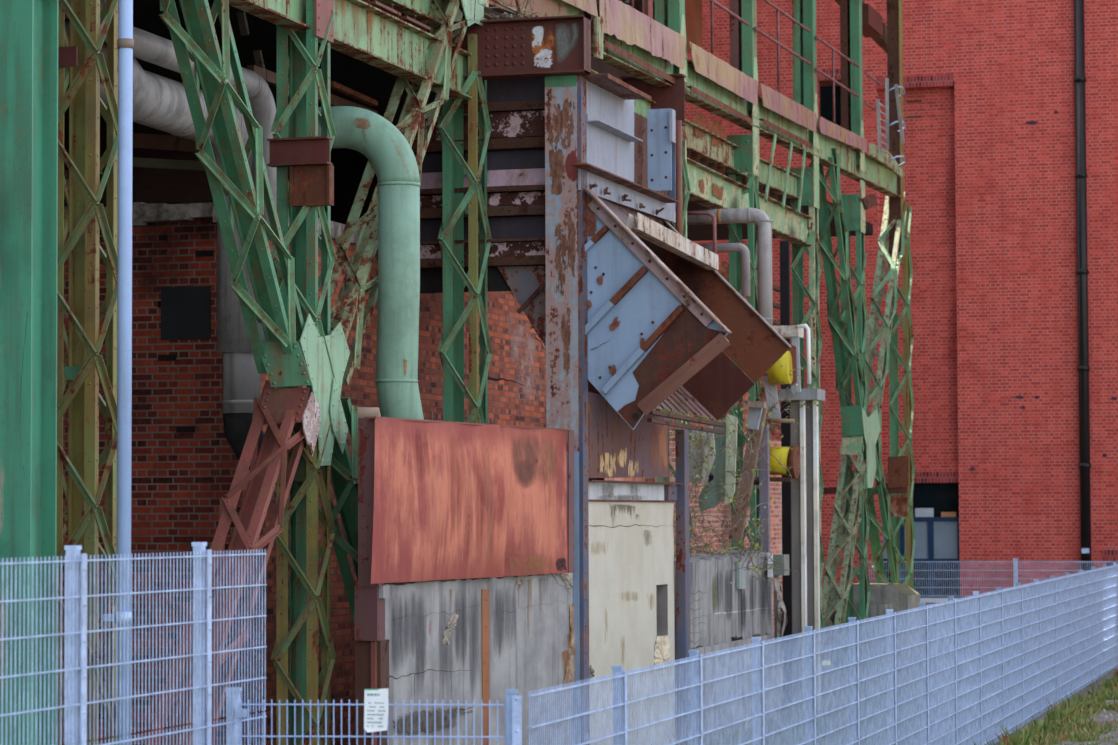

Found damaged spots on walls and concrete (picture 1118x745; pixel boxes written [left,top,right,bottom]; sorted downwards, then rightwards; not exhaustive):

peeling [530,26,555,68]
rust [676,260,701,299]
leakage [393,601,431,665]
leakage [445,605,476,671]